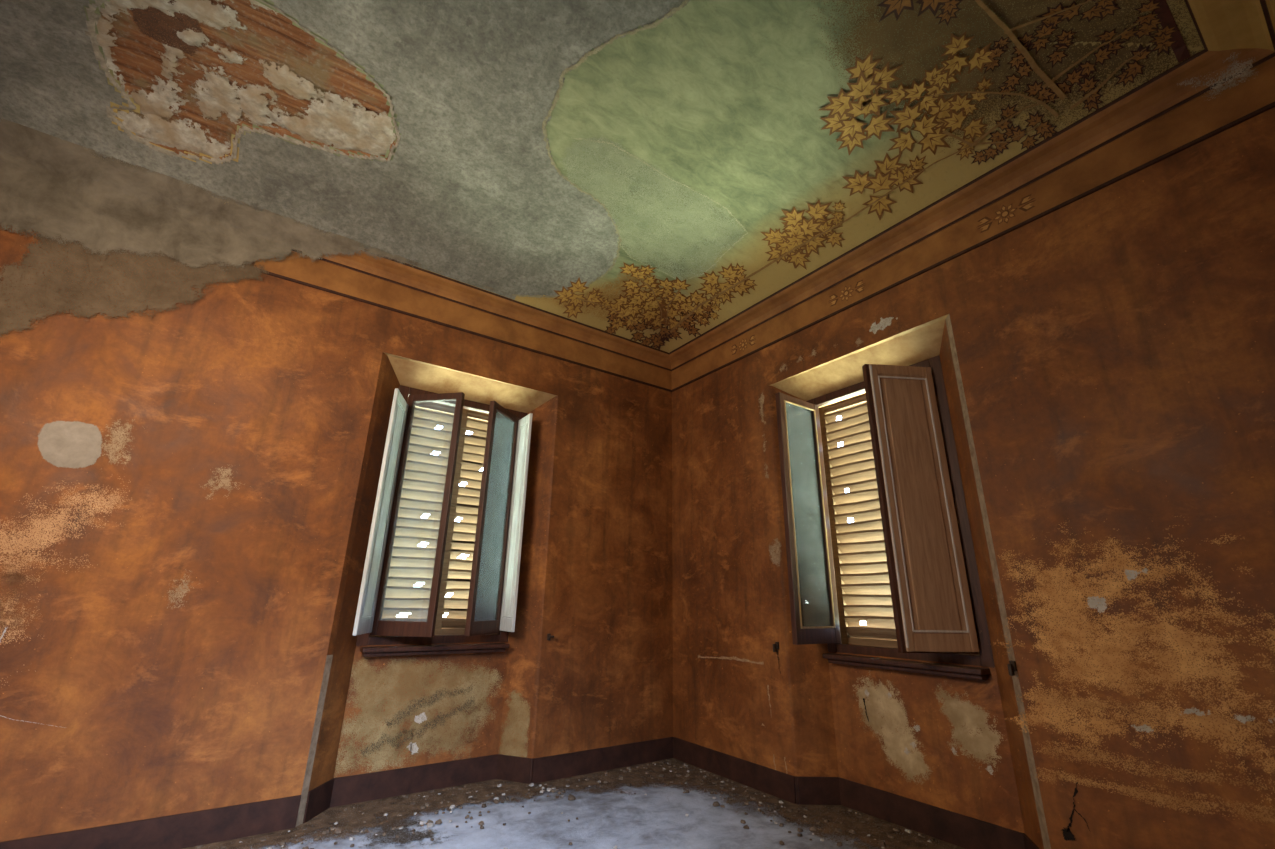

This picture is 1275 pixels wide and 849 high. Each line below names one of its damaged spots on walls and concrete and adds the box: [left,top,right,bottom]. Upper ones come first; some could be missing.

peeling [0,0,690,337]
peeling [334,656,530,778]
peeling [852,670,931,785]
water stain [1034,740,1275,826]